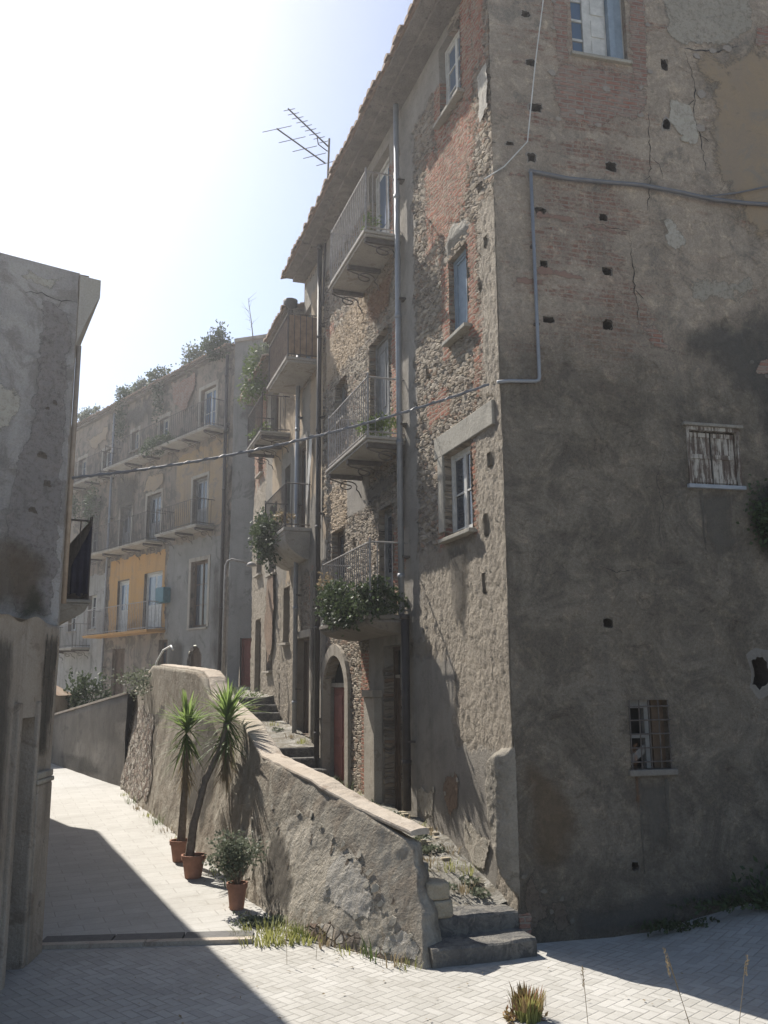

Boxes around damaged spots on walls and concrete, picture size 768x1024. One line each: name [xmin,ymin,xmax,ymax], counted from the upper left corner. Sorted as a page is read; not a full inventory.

flaking render [477,63,488,122]
flaking render [661,100,699,144]
crack [685,53,709,170]
spalling [605,160,618,173]
crack [599,224,643,322]
spalling [746,648,768,700]